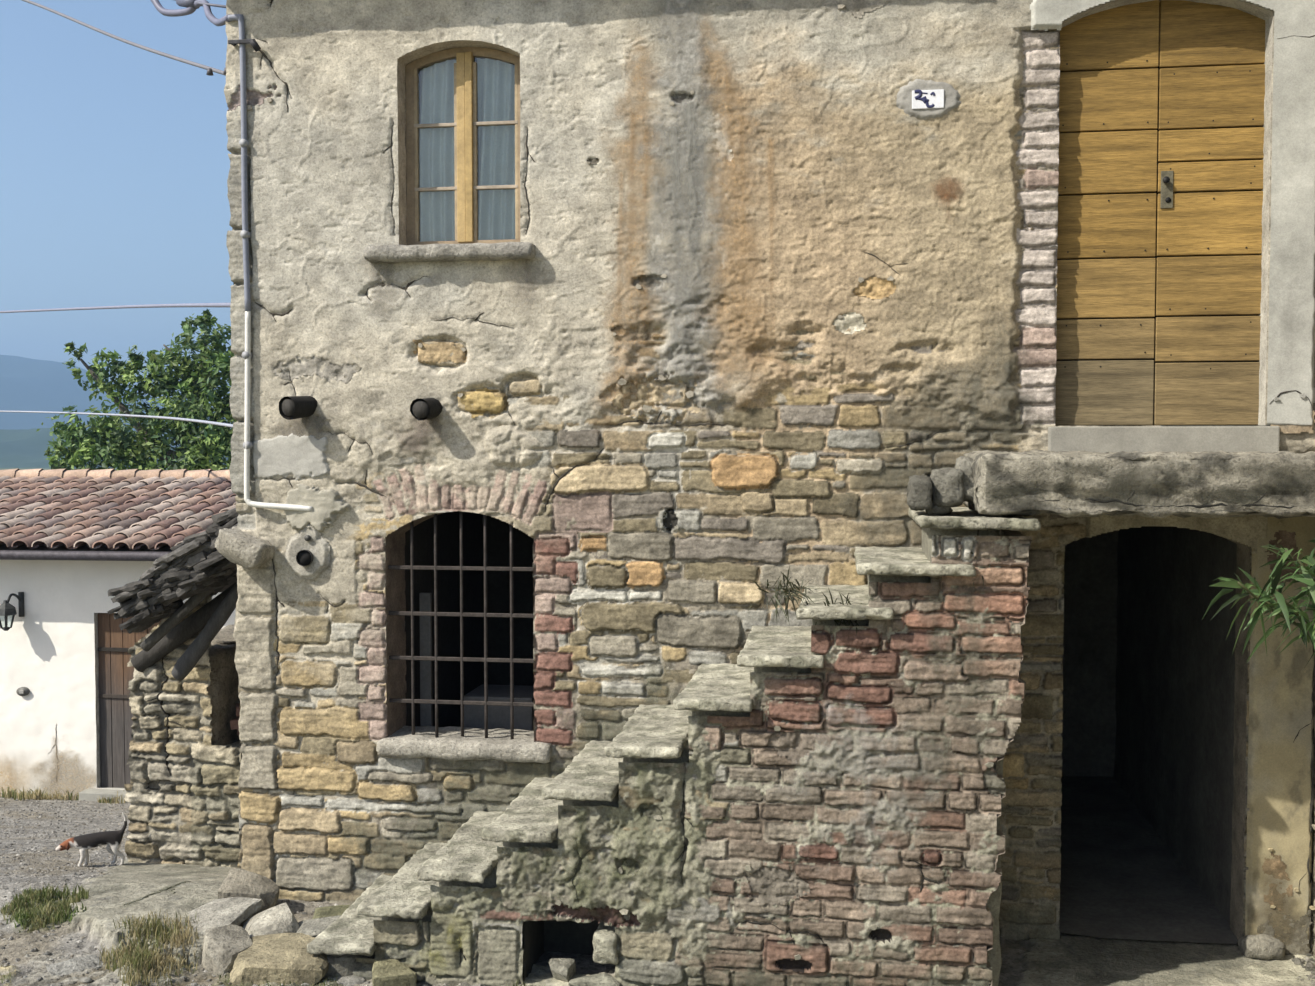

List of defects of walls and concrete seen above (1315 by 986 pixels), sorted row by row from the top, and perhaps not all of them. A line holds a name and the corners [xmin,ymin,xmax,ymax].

crack [251,38,291,112]
crack [383,120,394,234]
crack [524,134,535,234]
leakage [641,0,728,409]
crack [366,276,427,301]
crack [442,312,509,327]
peeling [1265,522,1304,583]